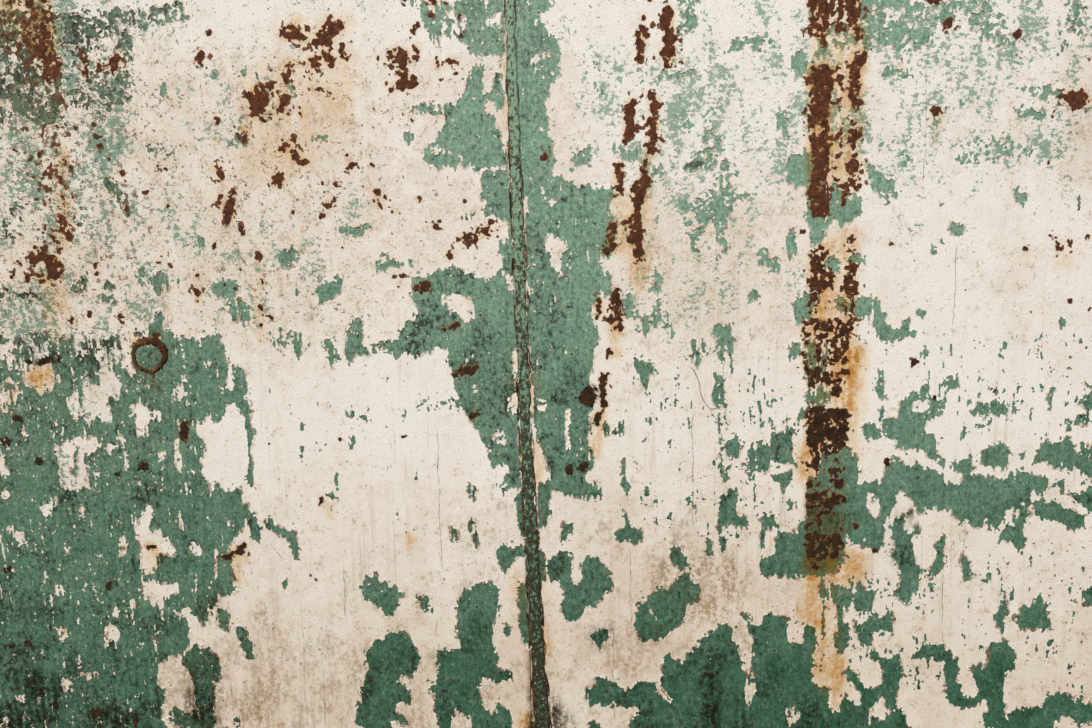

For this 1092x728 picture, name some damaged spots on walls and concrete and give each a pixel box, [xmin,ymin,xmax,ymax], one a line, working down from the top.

corrosion [0,0,79,297]
peeling [0,0,190,139]
corrosion [242,14,353,122]
corrosion [599,89,665,264]
corrosion [634,0,684,71]
peeling [756,146,902,275]
corrosion [800,0,872,221]
peeling [787,0,1026,82]
peeling [0,311,301,728]
peeling [263,0,675,728]
corrosion [797,234,865,570]
peeling [584,290,1092,728]